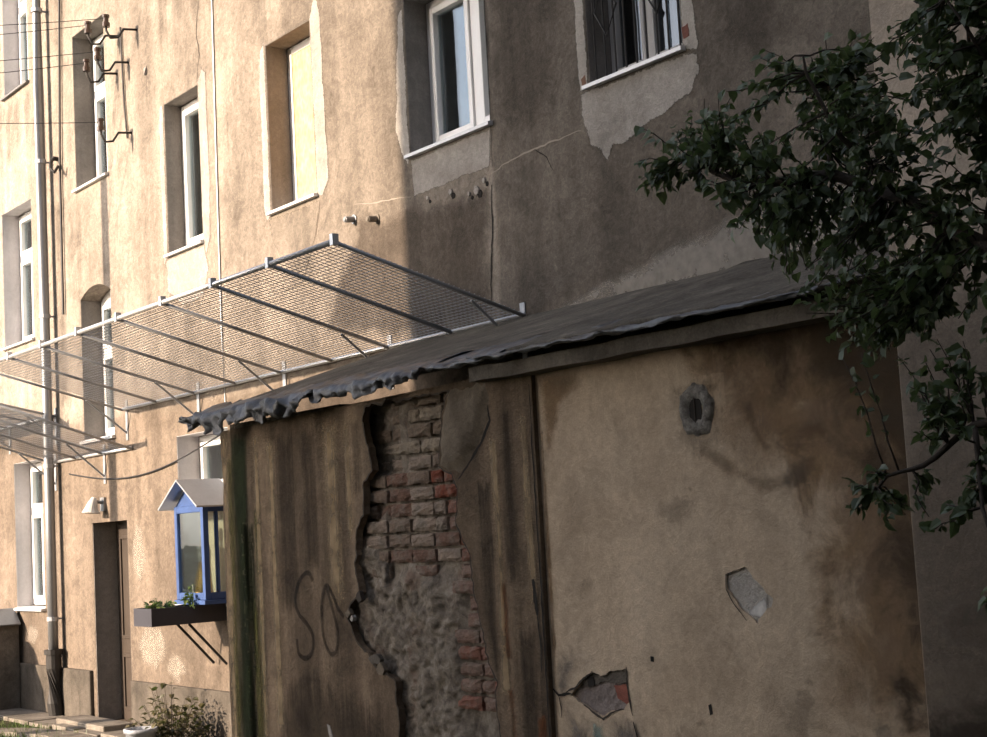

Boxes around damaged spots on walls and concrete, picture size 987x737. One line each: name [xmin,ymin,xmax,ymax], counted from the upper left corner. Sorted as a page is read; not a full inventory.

crack [484,0,581,311]
damp [801,317,910,503]
spalling [345,393,501,737]
peeling [725,567,773,622]
flaking render [565,668,633,721]